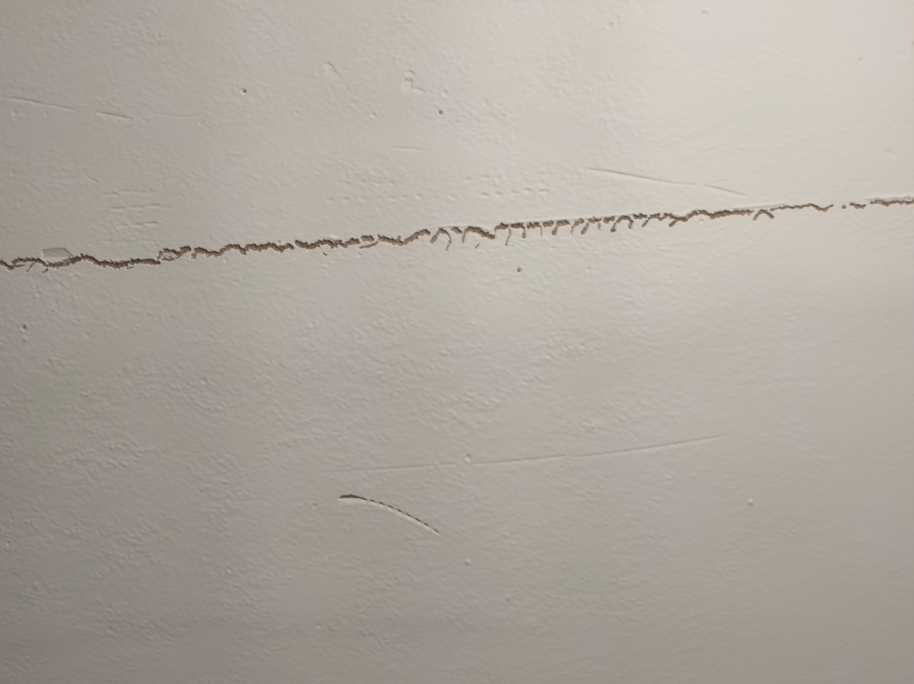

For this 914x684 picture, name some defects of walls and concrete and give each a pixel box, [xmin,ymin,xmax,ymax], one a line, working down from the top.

crack [0,193,914,276]